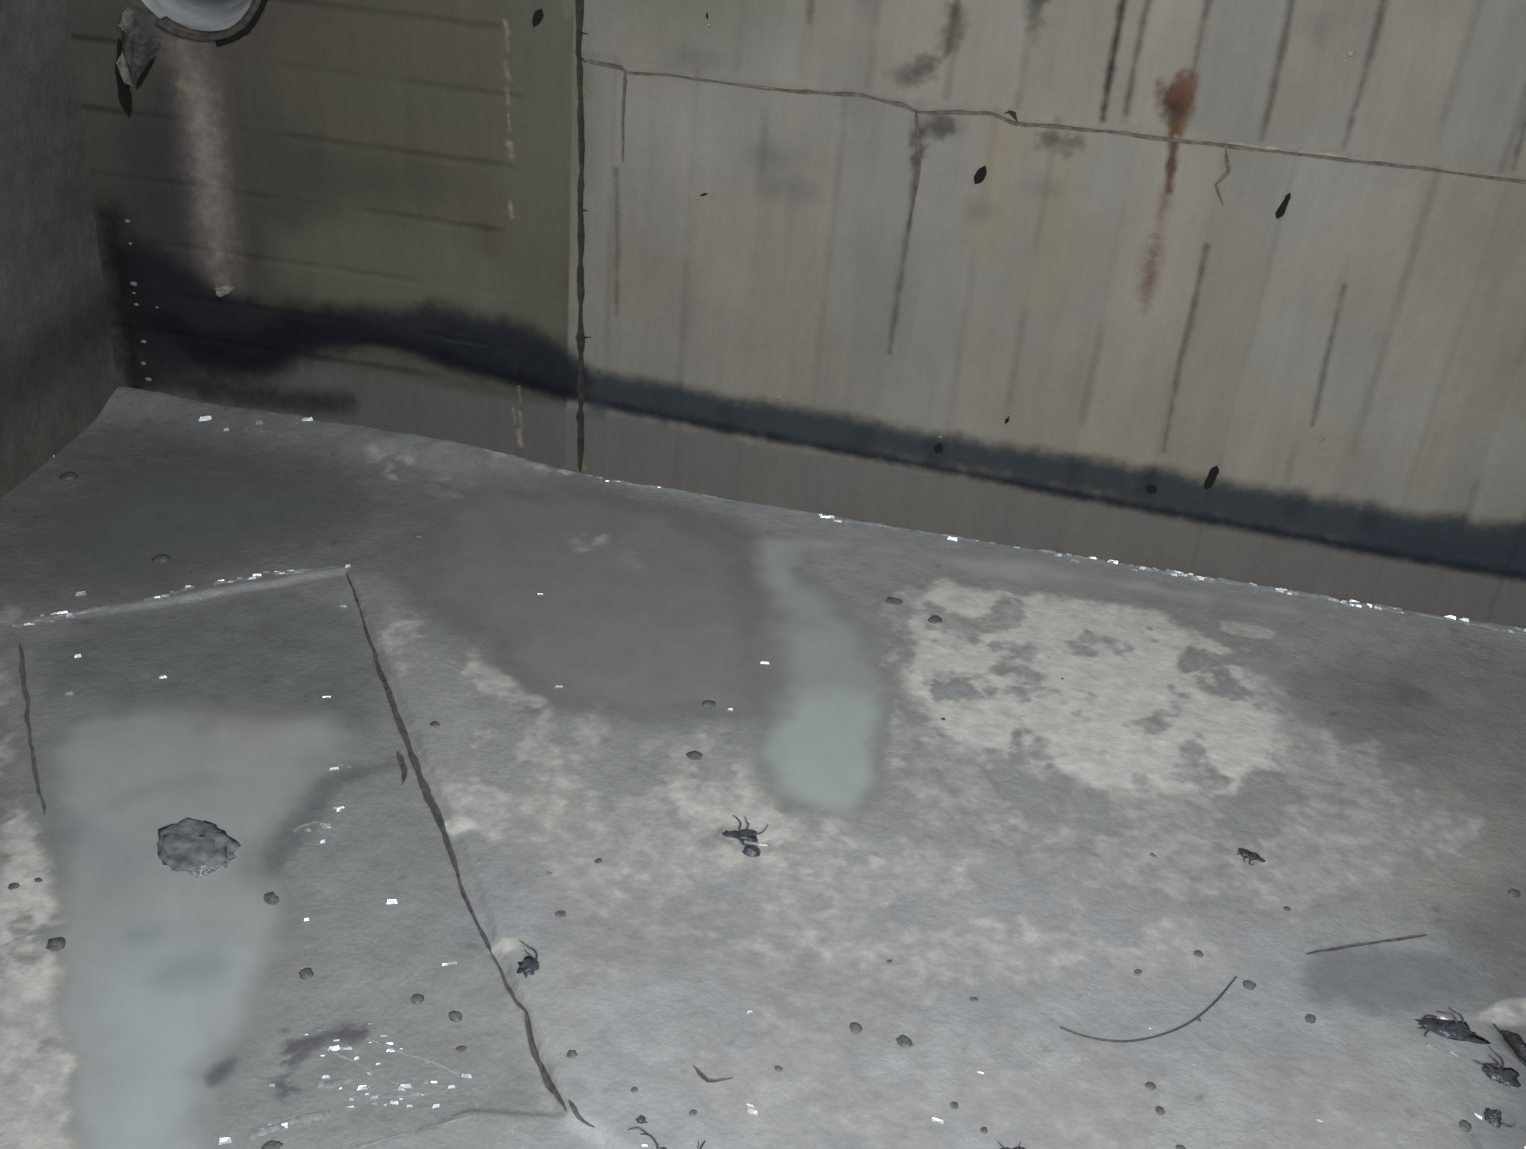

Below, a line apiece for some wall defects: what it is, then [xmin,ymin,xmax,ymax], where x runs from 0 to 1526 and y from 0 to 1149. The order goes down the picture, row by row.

rust [1163,74,1196,193]
leakage [108,20,1526,580]
crack [565,0,1526,472]
crack [19,643,46,814]
leakage [379,620,425,677]
leakage [0,809,79,1149]
leakage [286,1028,365,1064]
crack [347,573,595,1128]
crack [692,1065,733,1082]
leakage [436,578,1487,1149]
crack [1306,934,1427,954]